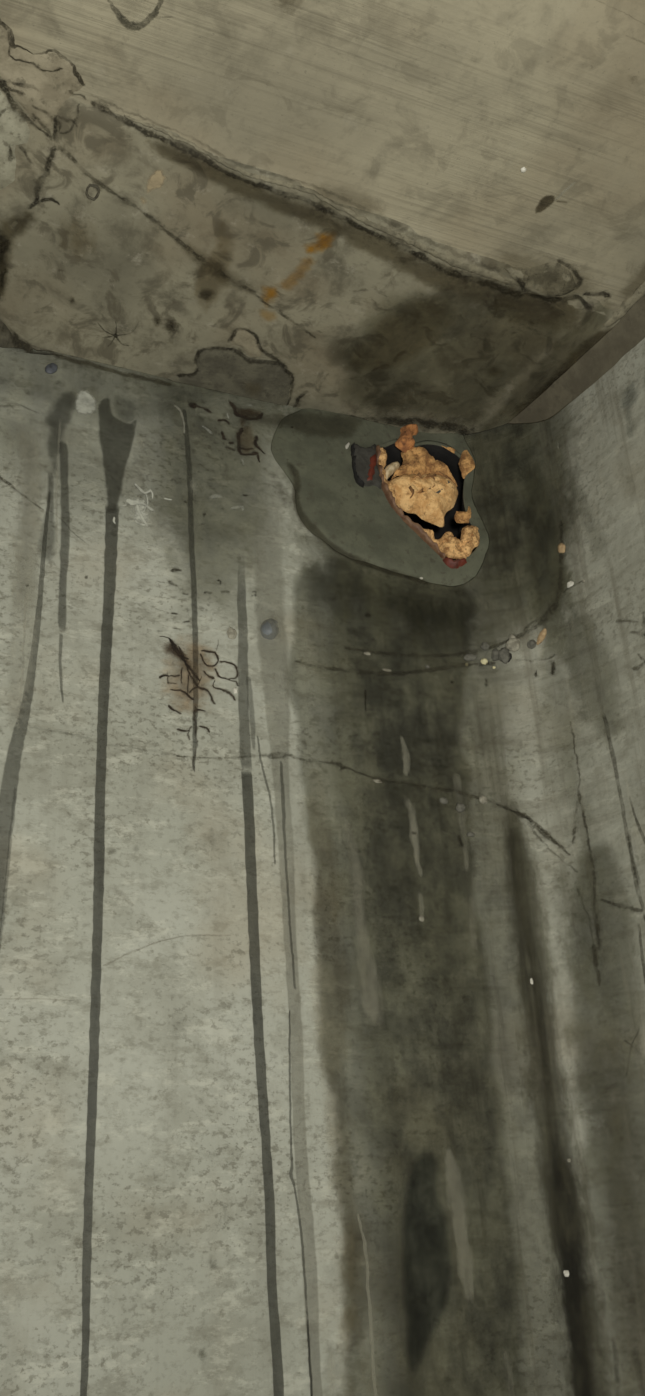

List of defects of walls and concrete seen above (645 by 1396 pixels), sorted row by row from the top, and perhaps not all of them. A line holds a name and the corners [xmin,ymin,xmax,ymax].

crack [0,19,611,407]
leakage [76,391,95,413]
peeling [443,557,467,569]
crack [616,618,645,670]
leakage [257,579,322,1396]
leakage [563,1238,593,1396]